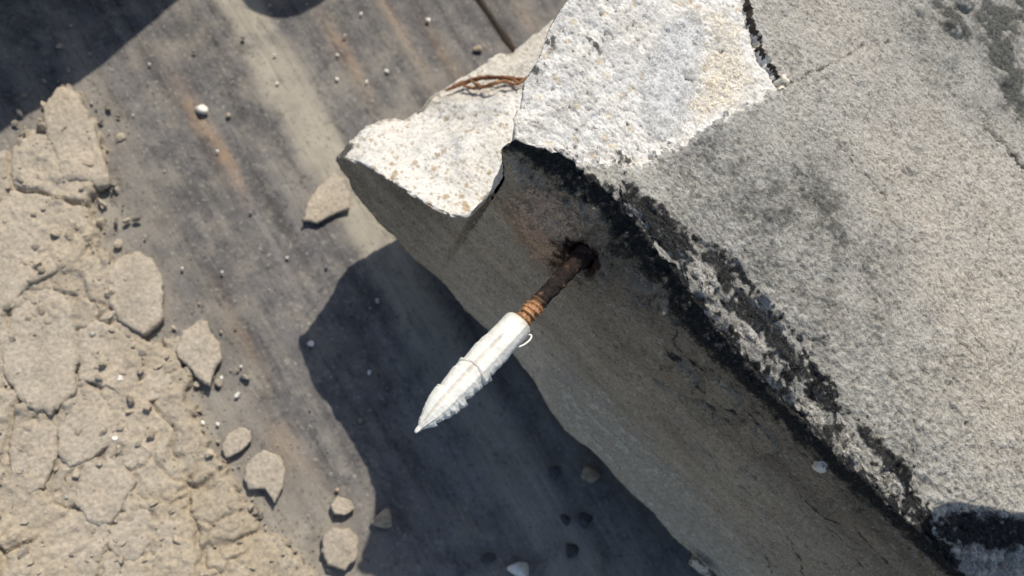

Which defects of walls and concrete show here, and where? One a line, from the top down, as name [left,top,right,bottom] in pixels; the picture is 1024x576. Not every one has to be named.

spalling [338,0,782,218]
crack [742,0,890,90]
corrosion [549,238,600,286]
leakage [502,140,1024,576]